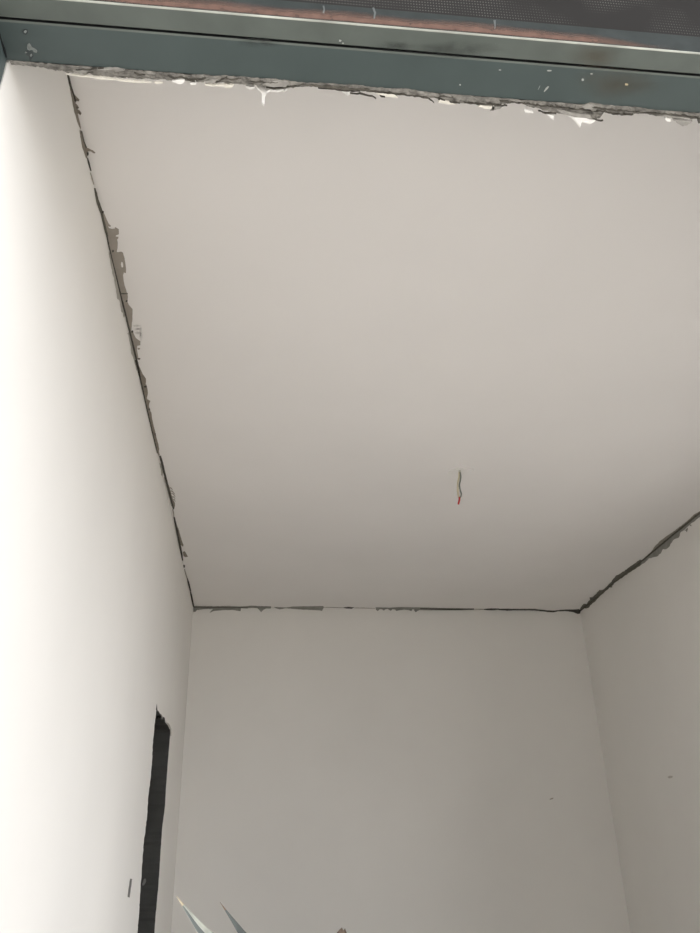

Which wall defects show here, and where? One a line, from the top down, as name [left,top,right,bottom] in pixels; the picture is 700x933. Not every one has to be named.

peeling [70,88,95,158]
peeling [102,210,176,508]
crack [324,512,700,614]